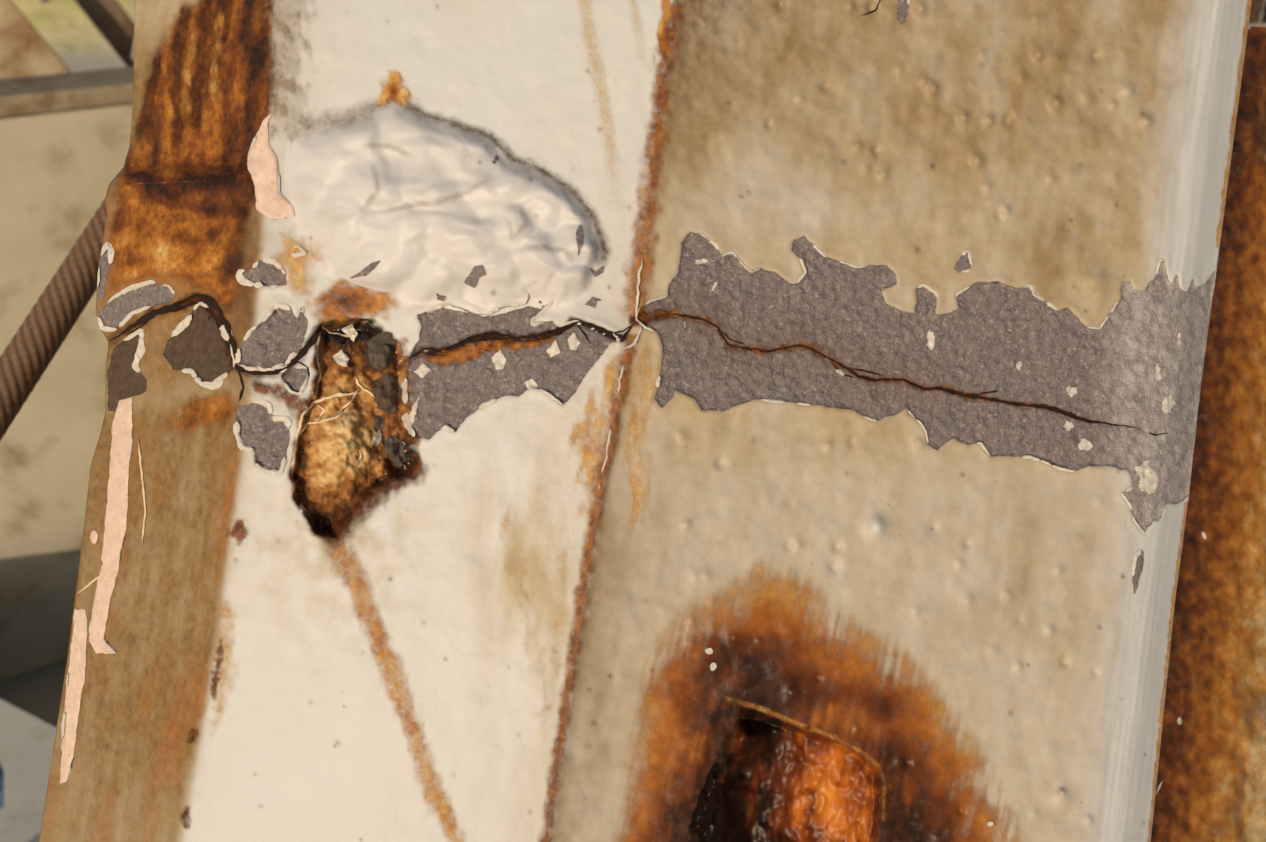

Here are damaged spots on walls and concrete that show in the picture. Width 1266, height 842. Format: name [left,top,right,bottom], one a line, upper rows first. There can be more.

peeling [97,242,176,411]
rust [112,0,273,309]
crack [109,293,377,401]
peeling [236,244,307,288]
spalling [163,293,621,536]
rust [541,0,681,842]
crack [404,309,1167,436]
peeling [636,232,1216,534]
rust [1149,0,1266,842]
rust [322,516,462,842]
rust [622,566,1017,842]
peeling [1132,549,1144,594]